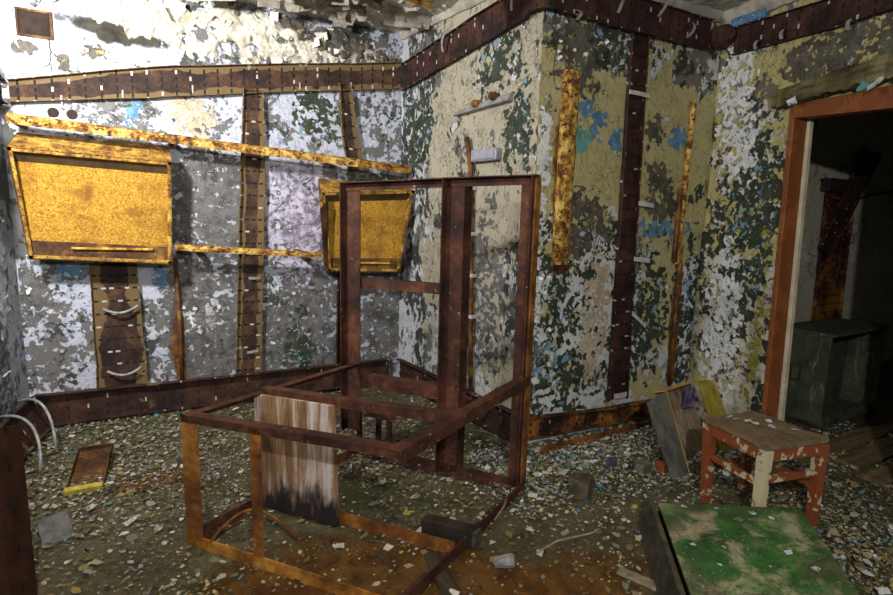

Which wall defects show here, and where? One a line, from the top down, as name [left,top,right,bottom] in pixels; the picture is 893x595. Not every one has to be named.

peeling [18,260,89,327]
peeling [152,96,240,379]
flaking render [45,0,446,74]
peeling [262,143,337,369]
peeling [292,91,340,155]
peeling [401,74,435,194]
peeling [468,190,507,373]
peeling [472,11,630,221]
rust [552,121,560,230]
peeling [530,185,612,415]
rust [667,248,684,384]
peeling [630,43,797,405]